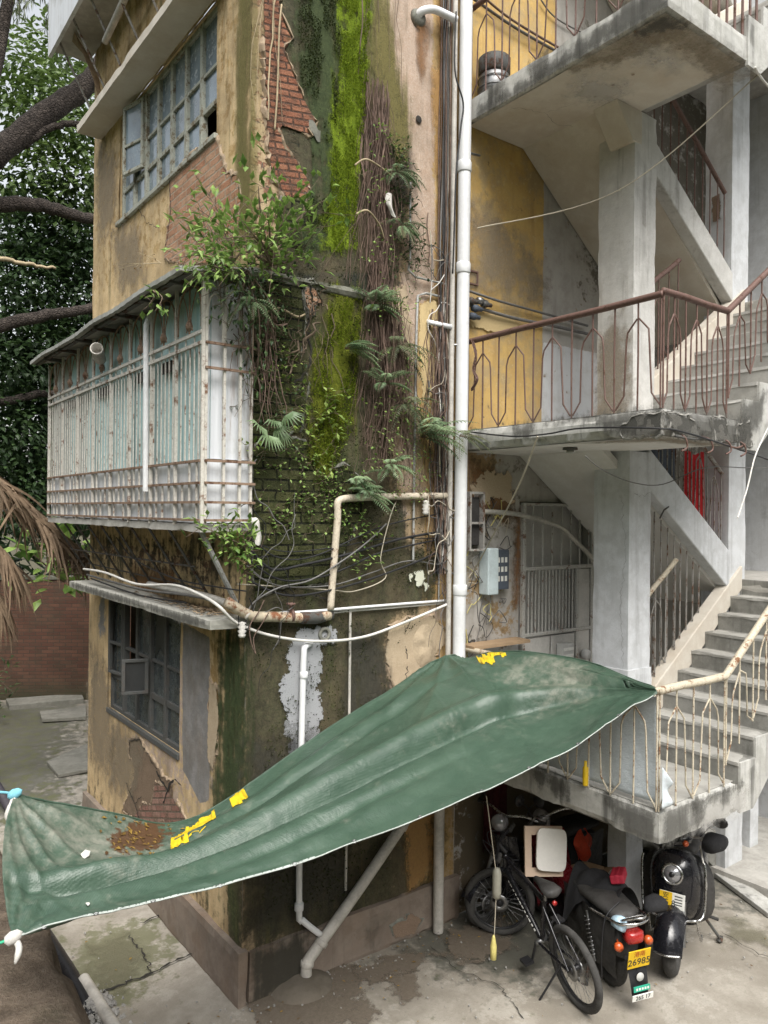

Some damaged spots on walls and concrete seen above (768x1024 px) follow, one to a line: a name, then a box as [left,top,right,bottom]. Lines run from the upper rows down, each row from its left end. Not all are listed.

water stain [478,0,753,116]
spalling [258,0,321,248]
spalling [164,132,241,266]
spalling [619,410,753,457]
corrosion [485,496,521,606]
peeling [385,612,446,687]
spalling [122,736,187,823]
water stain [534,768,570,802]
water stain [606,782,743,848]